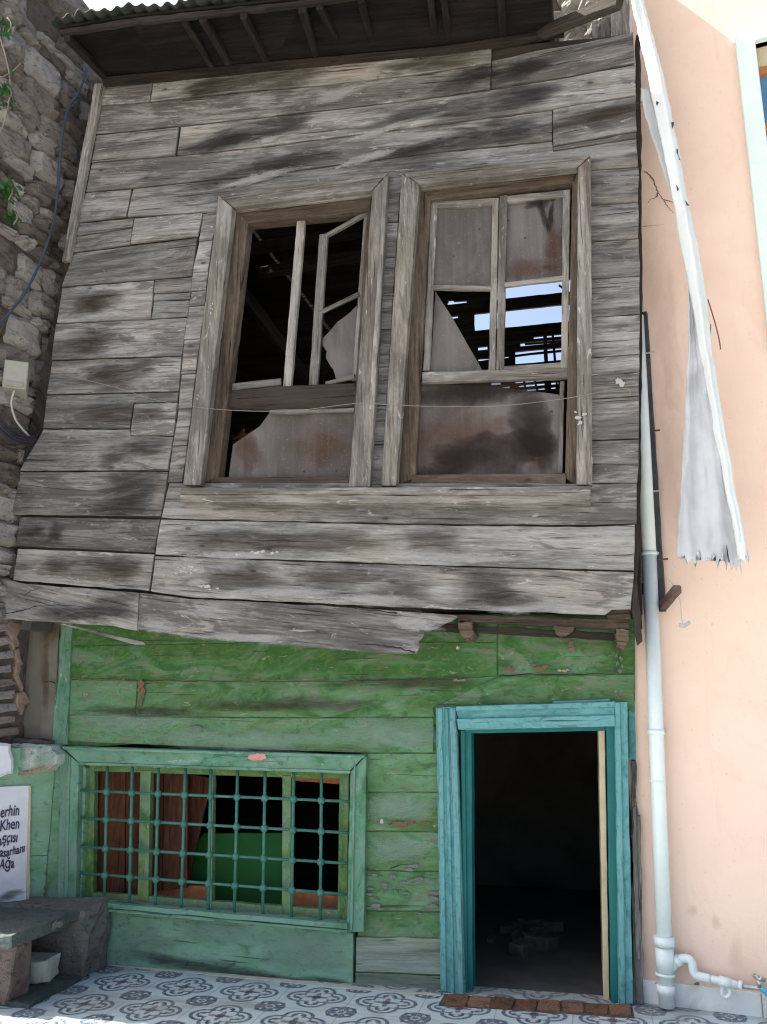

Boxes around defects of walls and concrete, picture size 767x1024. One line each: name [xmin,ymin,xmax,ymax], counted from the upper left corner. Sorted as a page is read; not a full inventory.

crack [602,171,674,227]
peeling [366,858,439,917]